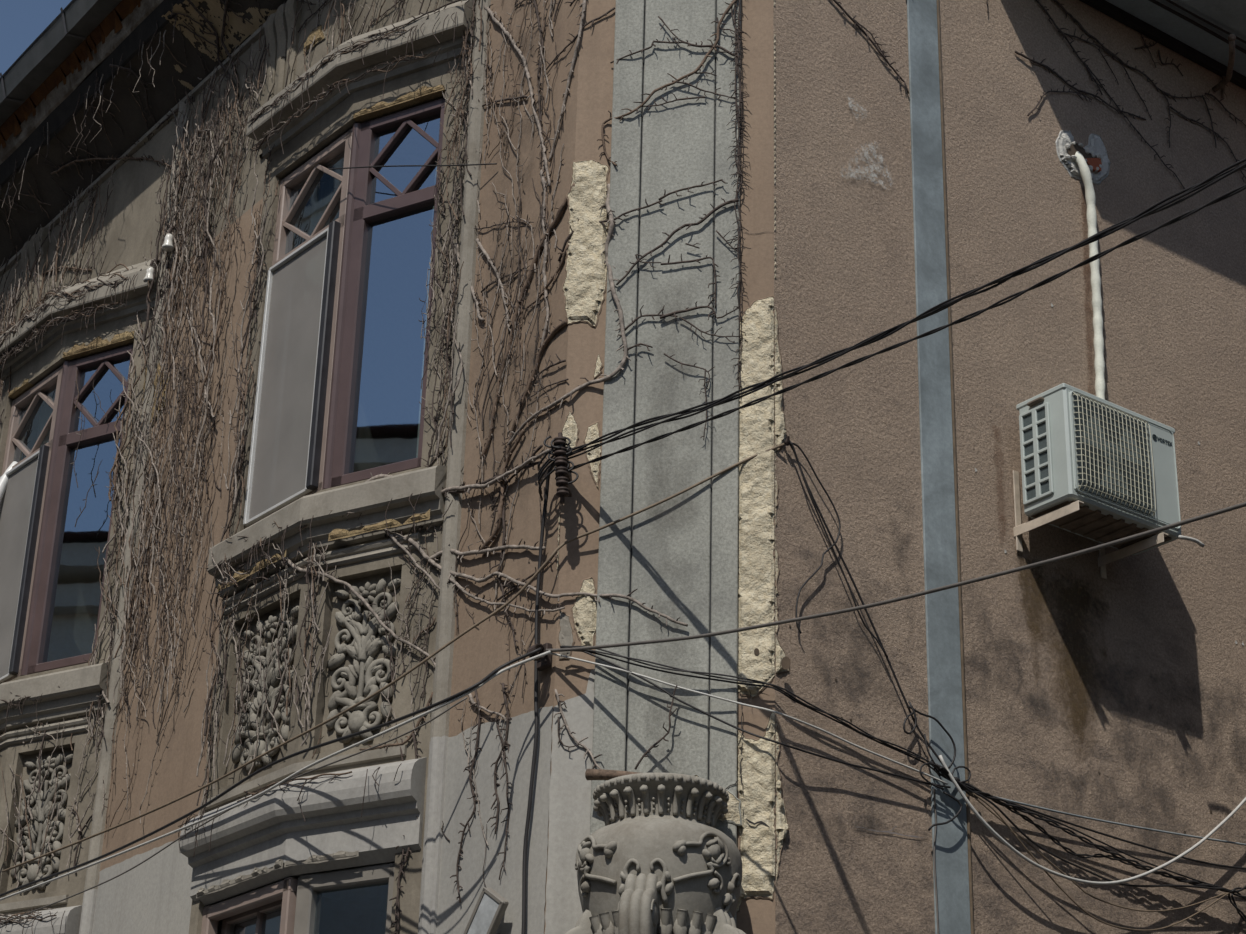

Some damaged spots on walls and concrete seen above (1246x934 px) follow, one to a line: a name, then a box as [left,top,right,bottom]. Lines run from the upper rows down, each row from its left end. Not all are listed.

flaking render [161,0,277,61]
flaking render [562,159,610,328]
flaking render [561,410,602,489]
flaking render [738,296,790,698]
flaking render [717,707,789,911]